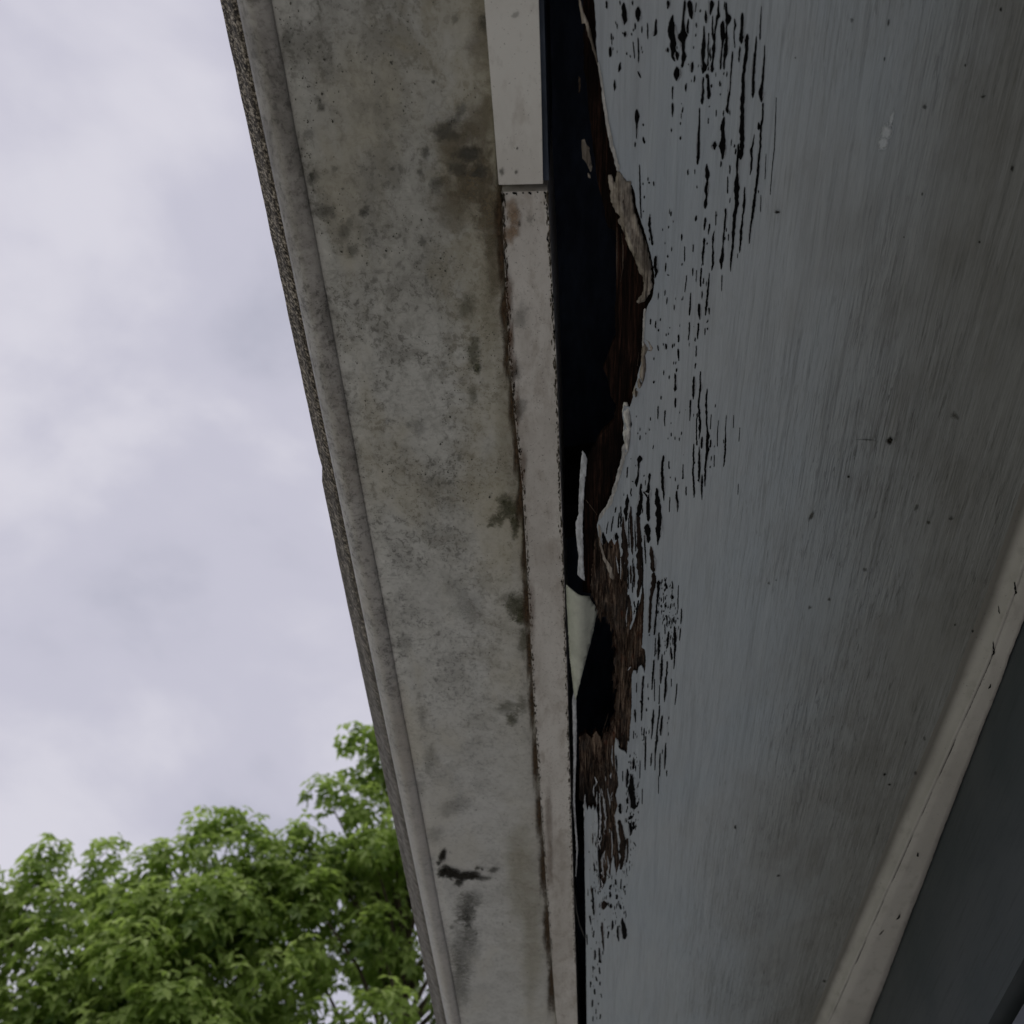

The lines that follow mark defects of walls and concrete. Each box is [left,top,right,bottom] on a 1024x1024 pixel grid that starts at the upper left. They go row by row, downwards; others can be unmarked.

water stain [442,120,520,242]
peeling [501,0,776,1021]